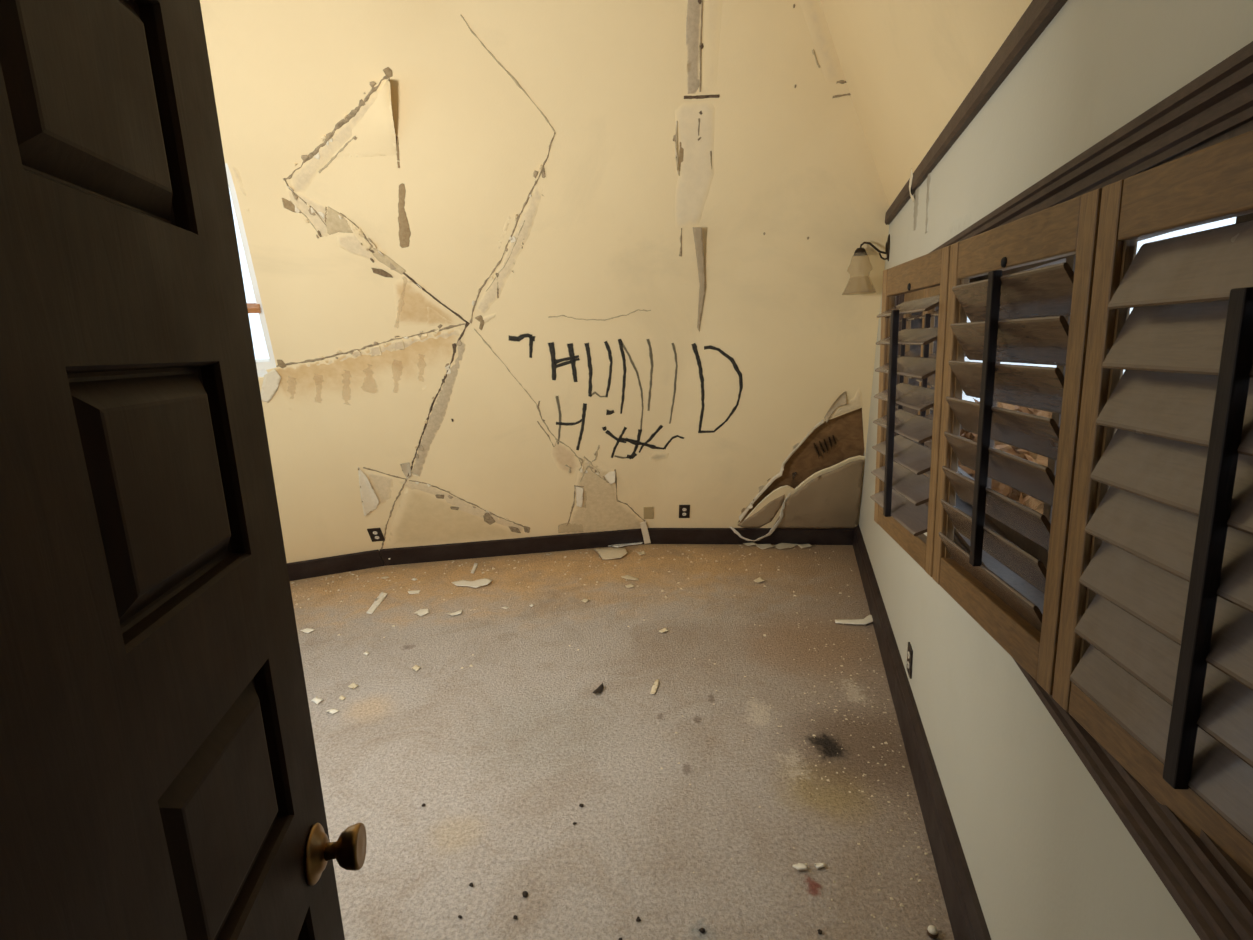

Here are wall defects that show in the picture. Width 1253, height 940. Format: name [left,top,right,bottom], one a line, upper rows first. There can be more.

peeling [294,132,332,166]
peeling [673,101,715,256]
peeling [282,185,325,238]
peeling [398,184,411,248]
peeling [350,223,396,277]
crack [276,15,582,549]
crack [548,310,651,321]
peeling [436,491,495,524]
spalling [558,445,651,555]
spalling [729,388,864,549]